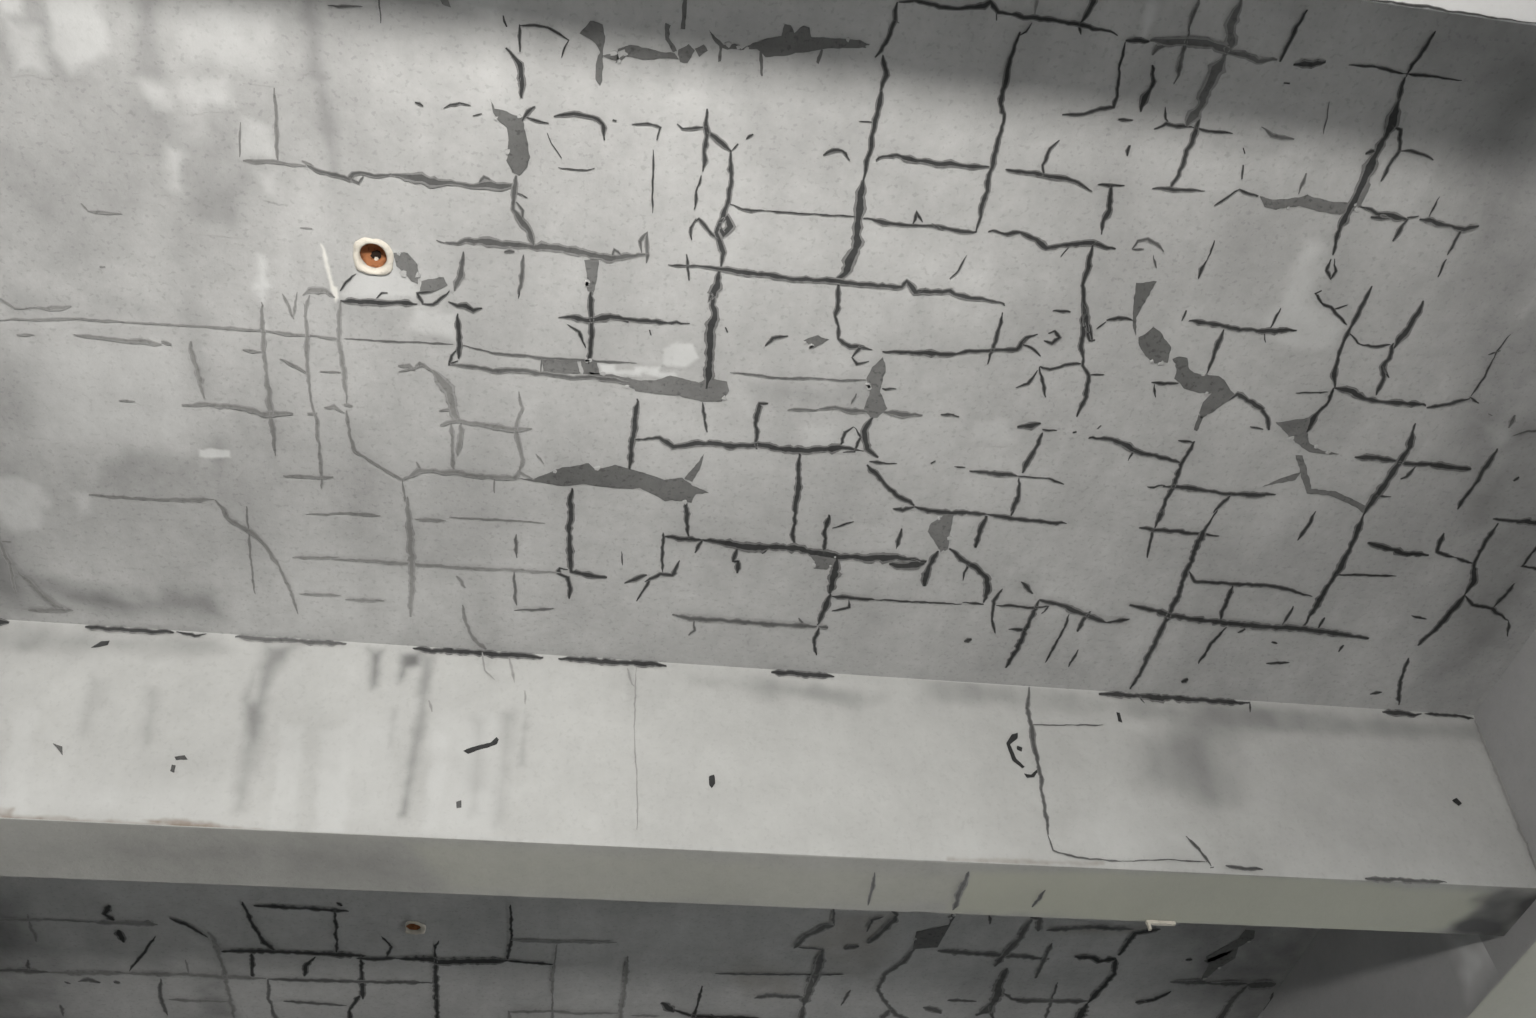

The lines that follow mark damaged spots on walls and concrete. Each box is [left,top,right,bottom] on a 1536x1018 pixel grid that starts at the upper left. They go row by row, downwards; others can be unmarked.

spalling [580,0,870,85]
spalling [491,102,530,176]
crack [0,0,1536,705]
spalling [1133,281,1234,431]
spalling [518,454,709,504]
crack [627,666,638,826]
crack [1025,687,1263,871]
crack [0,872,1276,1018]
spalling [912,914,956,949]
crack [1365,876,1447,884]